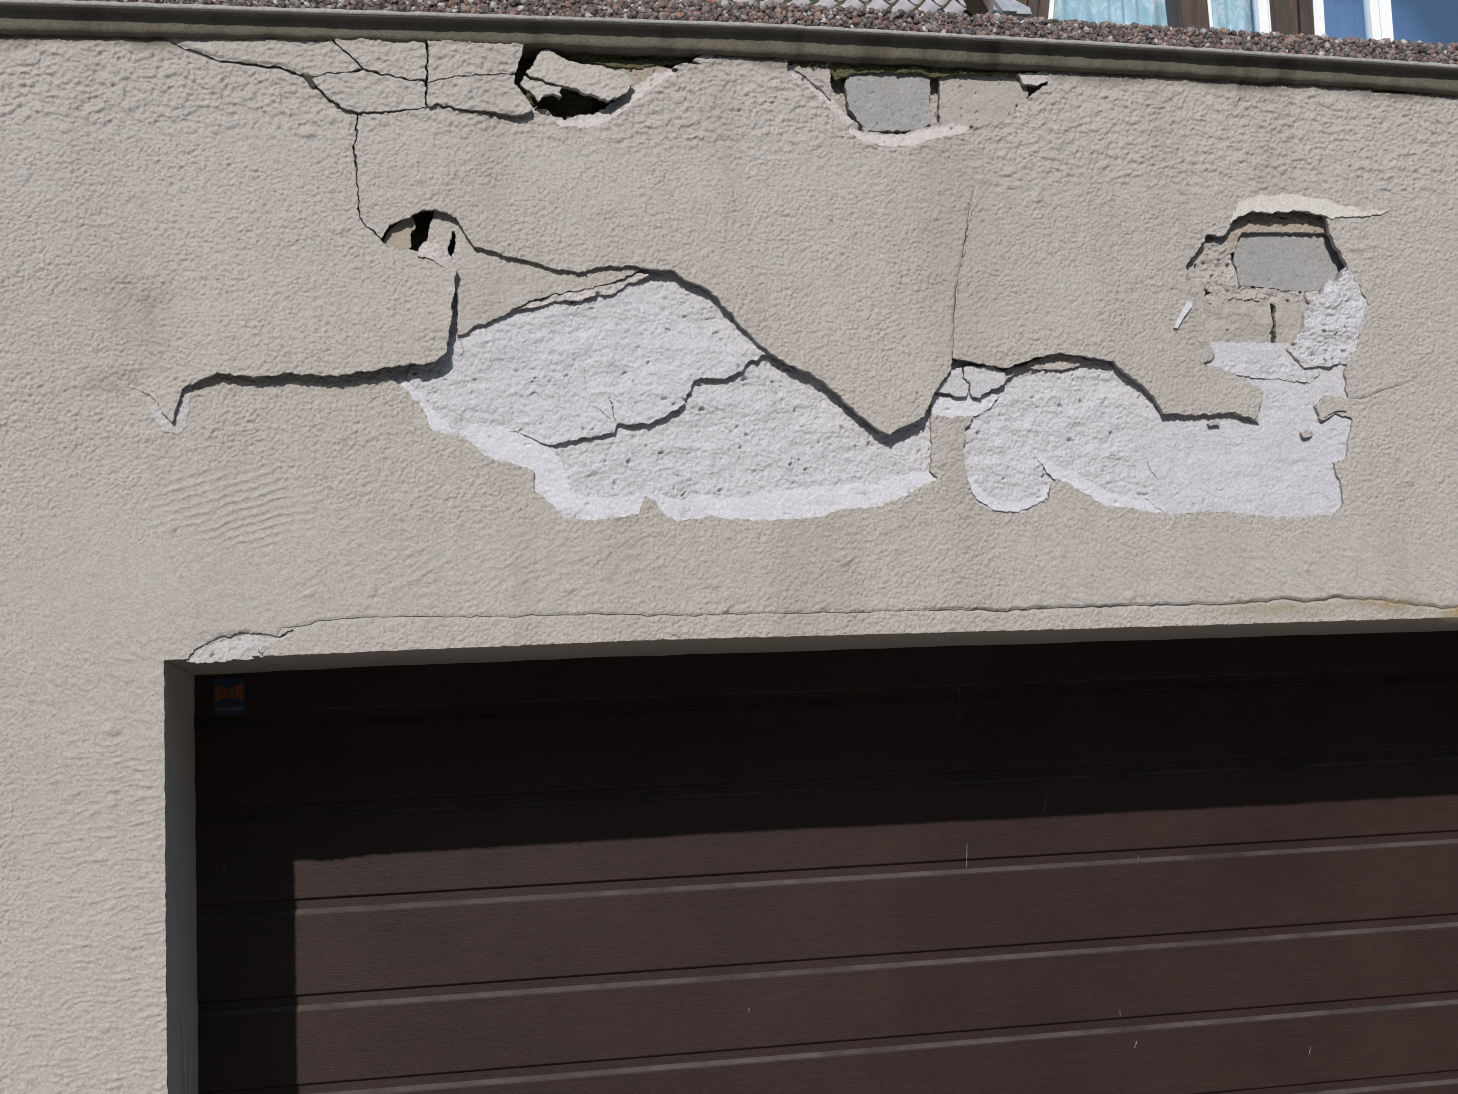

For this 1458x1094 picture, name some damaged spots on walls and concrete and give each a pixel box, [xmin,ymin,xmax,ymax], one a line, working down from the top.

crack [174,43,466,232]
flaking render [514,49,714,129]
flaking render [787,60,1049,147]
crack [953,194,973,347]
flaking render [379,193,1389,521]
peeling [187,629,295,663]
crack [198,597,1457,655]